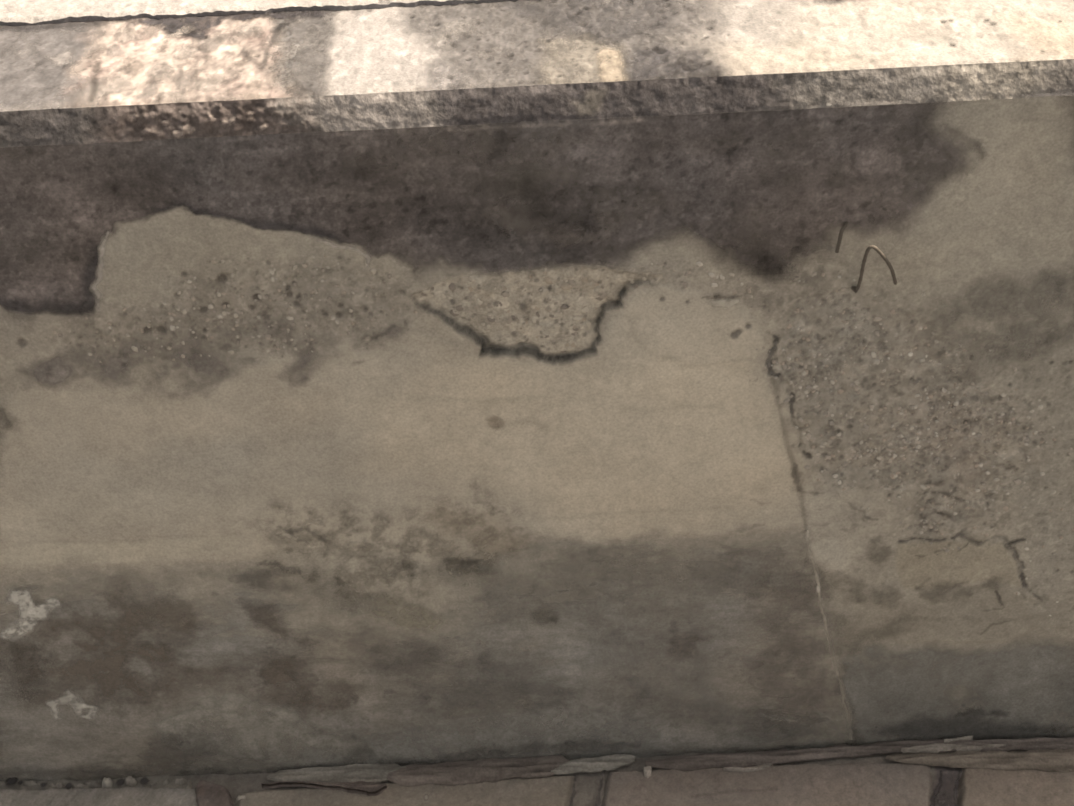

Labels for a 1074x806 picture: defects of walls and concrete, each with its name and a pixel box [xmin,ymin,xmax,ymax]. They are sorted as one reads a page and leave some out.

leakage [0,0,964,314]
spalling [86,255,392,363]
spalling [405,261,754,359]
spalling [756,271,1073,555]
crack [899,482,980,545]
crack [1008,539,1027,587]
leakage [0,511,839,781]
leakage [838,644,1074,745]